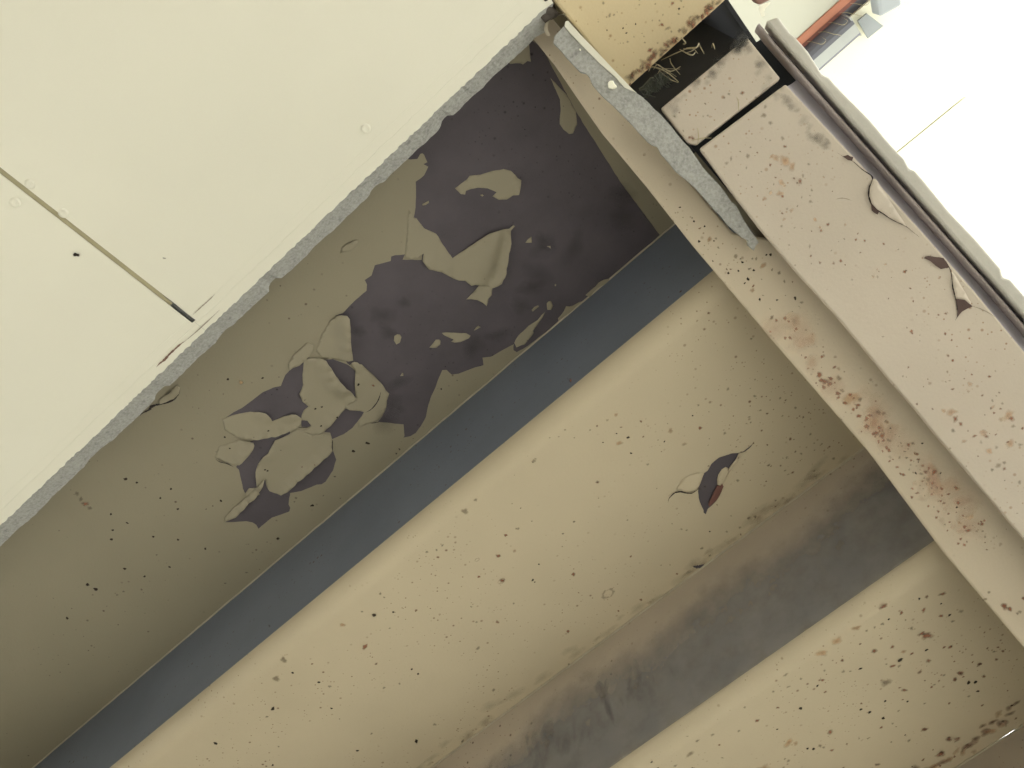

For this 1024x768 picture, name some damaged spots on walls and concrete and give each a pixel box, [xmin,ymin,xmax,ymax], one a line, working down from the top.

peeling [0,4,759,546]
rust [801,355,986,546]
rust [937,702,1018,767]